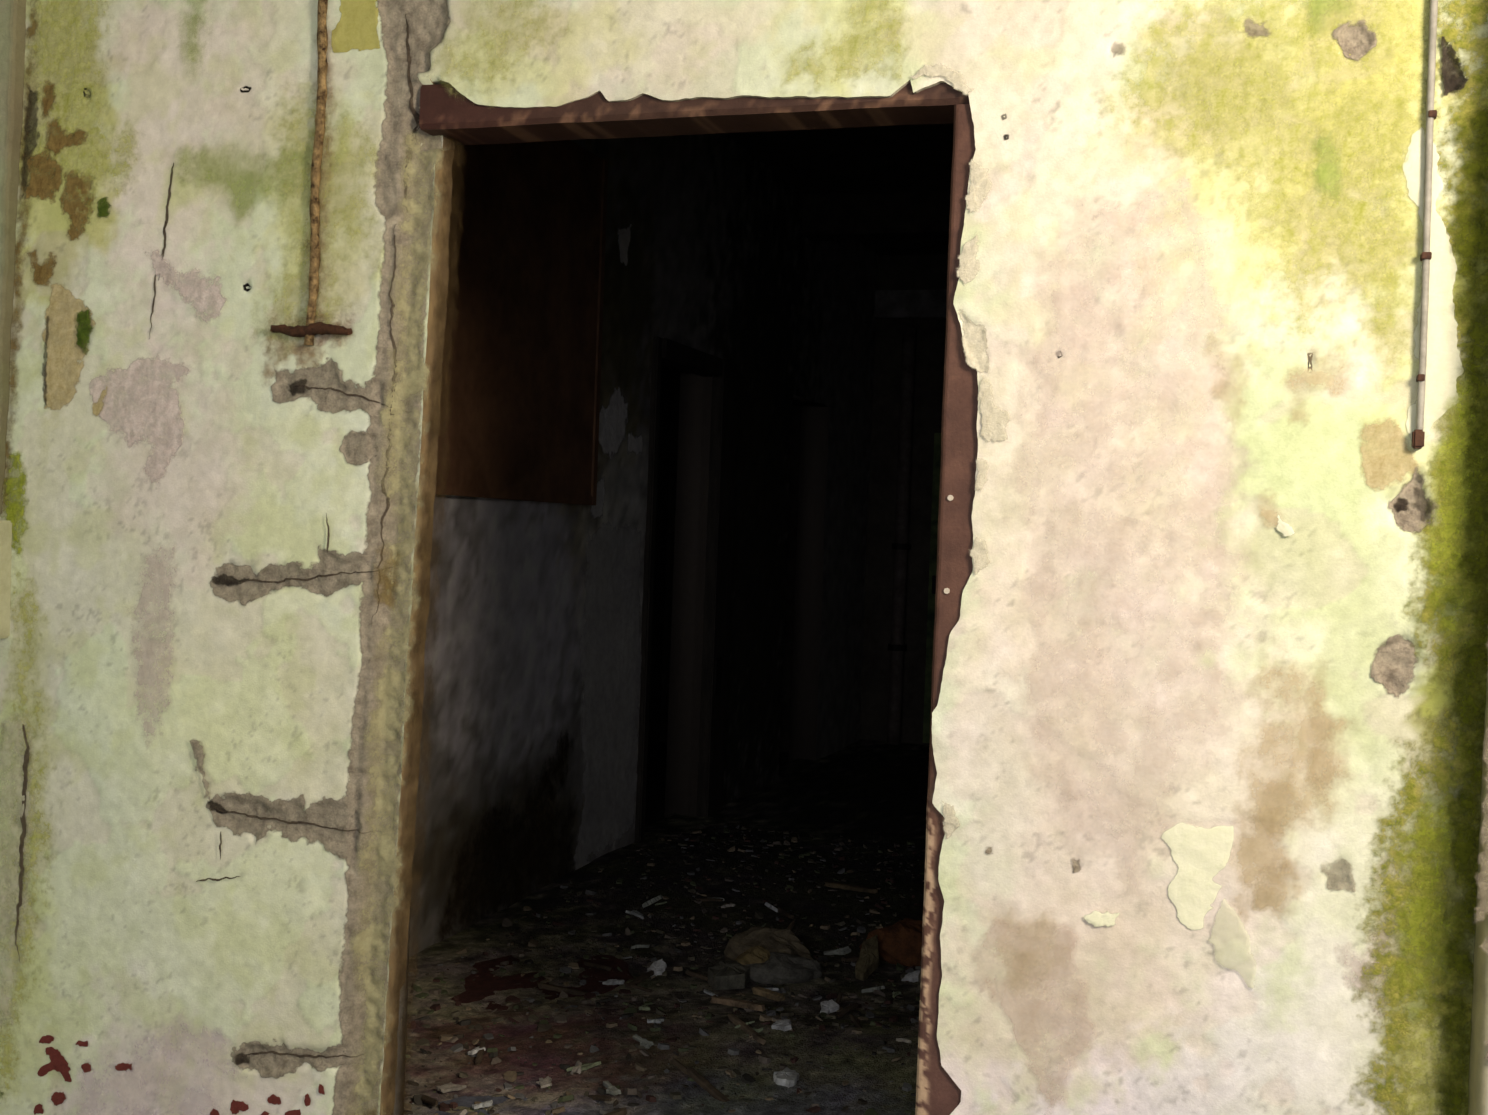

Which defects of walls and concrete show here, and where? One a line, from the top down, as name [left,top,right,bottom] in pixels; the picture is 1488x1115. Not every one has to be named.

peeling [25,83,94,241]
peeling [1361,127,1464,532]
spalling [190,0,463,1115]